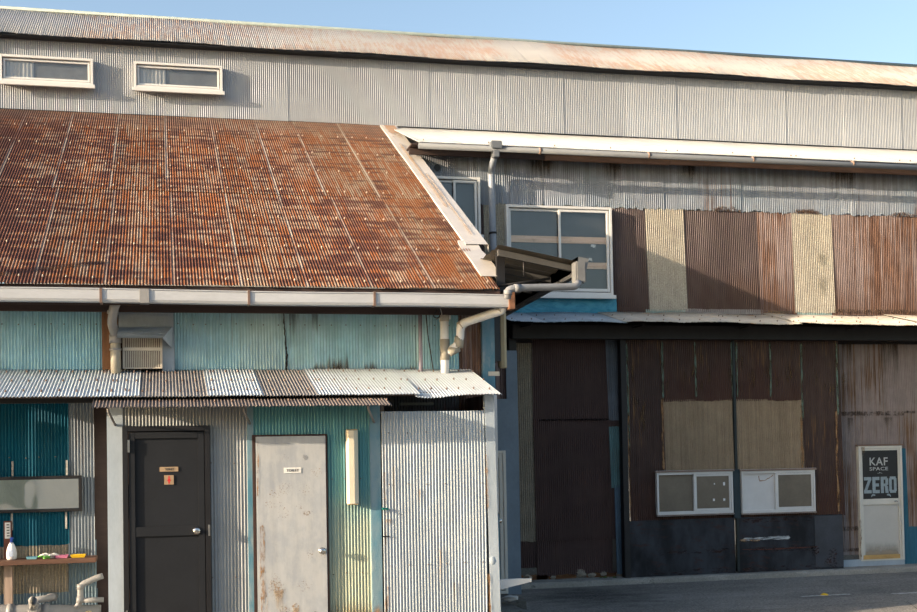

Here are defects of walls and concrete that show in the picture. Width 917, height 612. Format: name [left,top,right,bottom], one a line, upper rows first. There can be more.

crack [281,314,289,370]